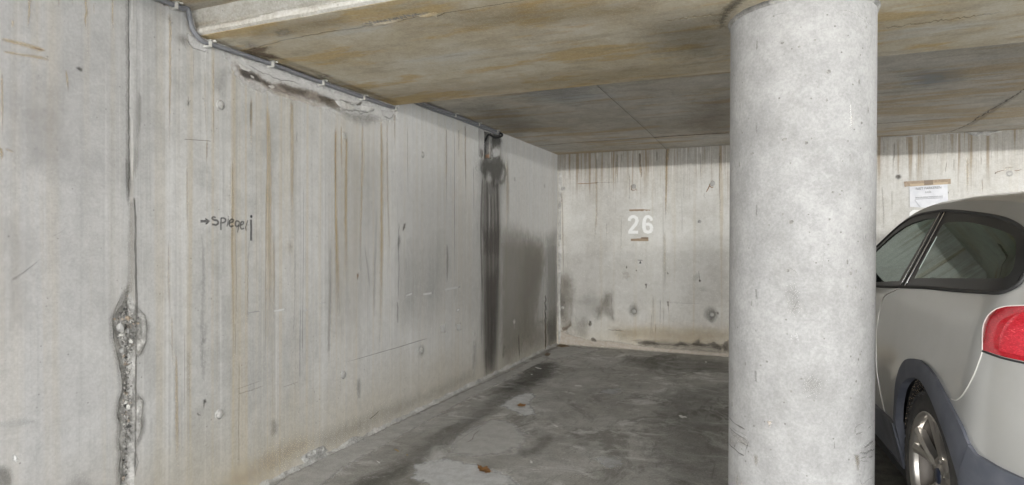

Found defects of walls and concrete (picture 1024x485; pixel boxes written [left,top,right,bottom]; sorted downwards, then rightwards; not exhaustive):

spalling [112,290,147,485]
water stain [277,134,728,485]